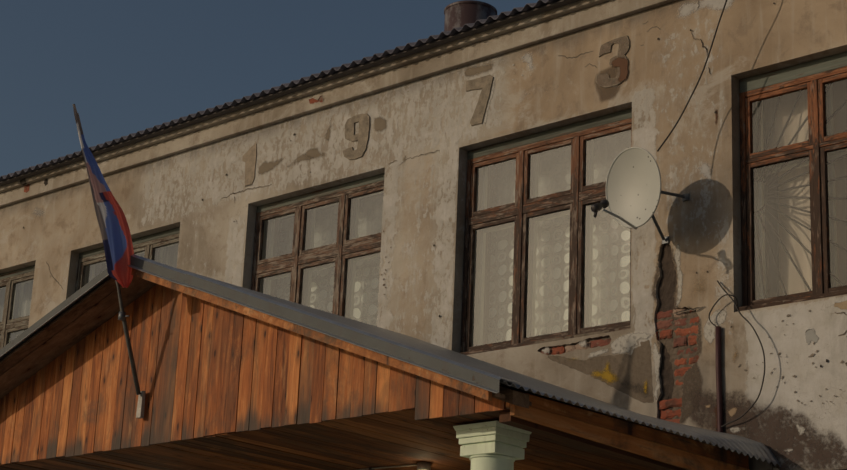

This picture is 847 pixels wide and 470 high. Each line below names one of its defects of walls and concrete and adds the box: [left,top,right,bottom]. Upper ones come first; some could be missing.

crack [220,184,271,201]
flaking render [534,243,726,424]
damp [679,319,847,470]